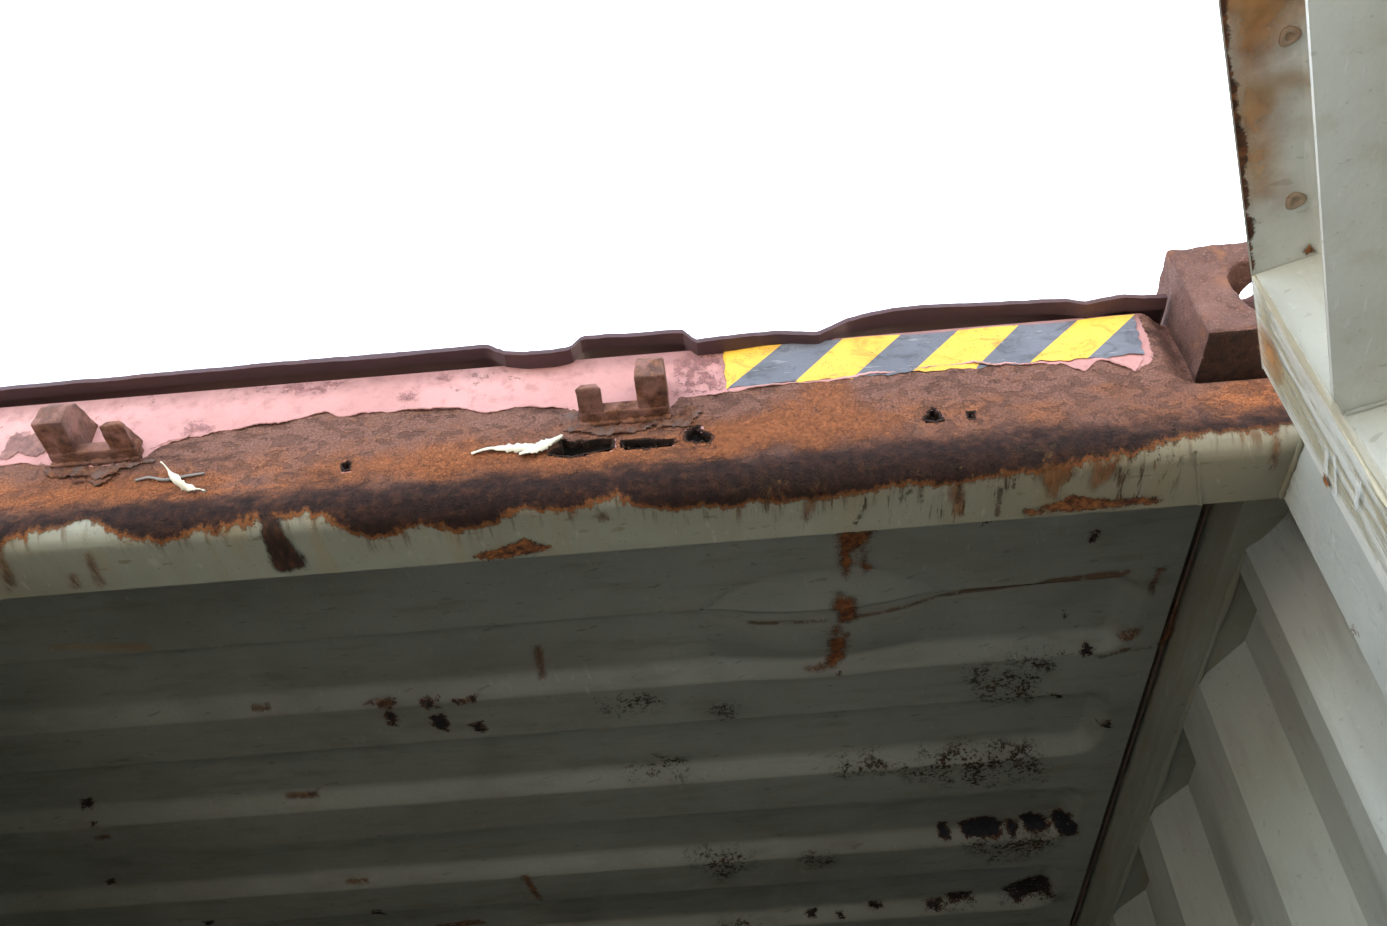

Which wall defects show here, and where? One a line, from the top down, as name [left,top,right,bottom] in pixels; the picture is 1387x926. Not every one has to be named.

rust [1220,0,1286,273]
rust [0,315,1293,585]
rust [750,570,1131,672]